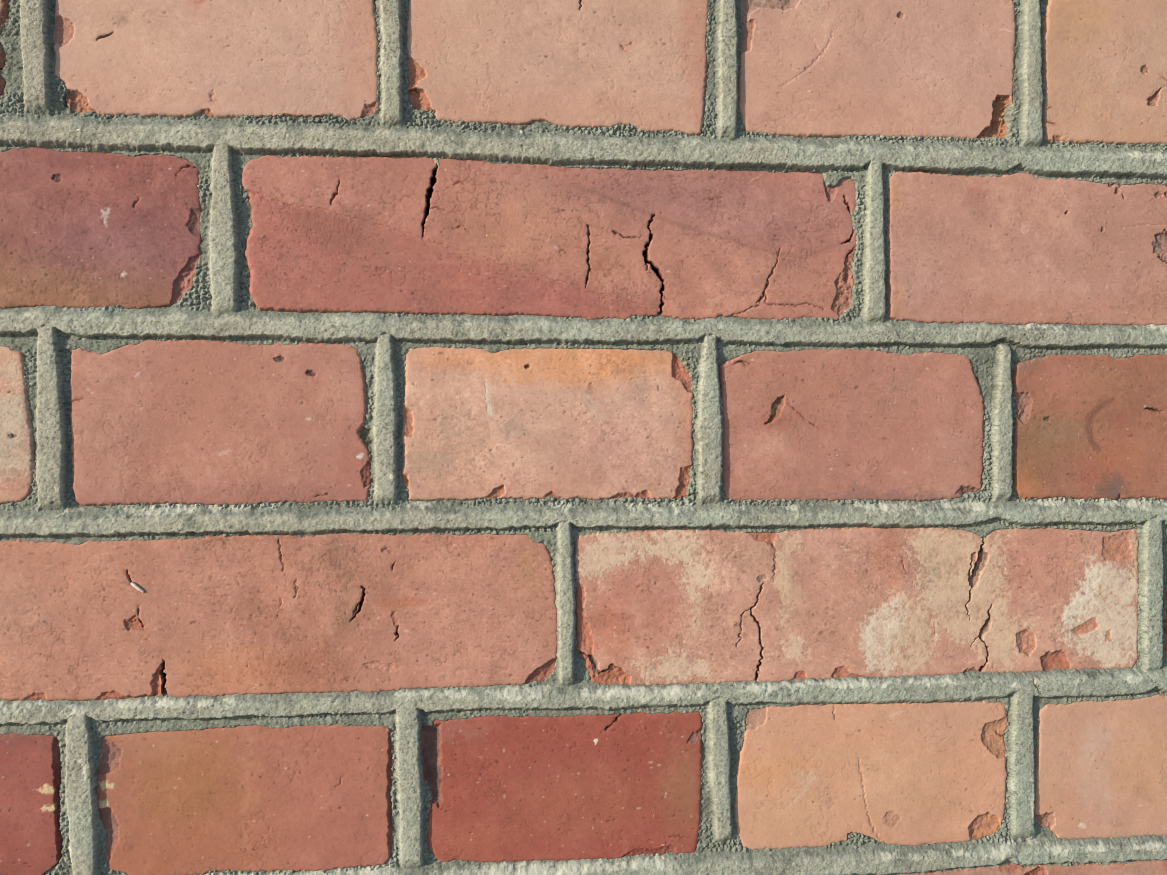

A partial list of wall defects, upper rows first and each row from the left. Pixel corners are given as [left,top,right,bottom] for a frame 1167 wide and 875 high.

spalling [977,94,1013,139]
crack [421,158,470,237]
crack [559,214,669,316]
water stain [550,499,572,515]
crack [735,543,777,681]
water stain [575,499,1144,704]
crack [961,538,994,673]